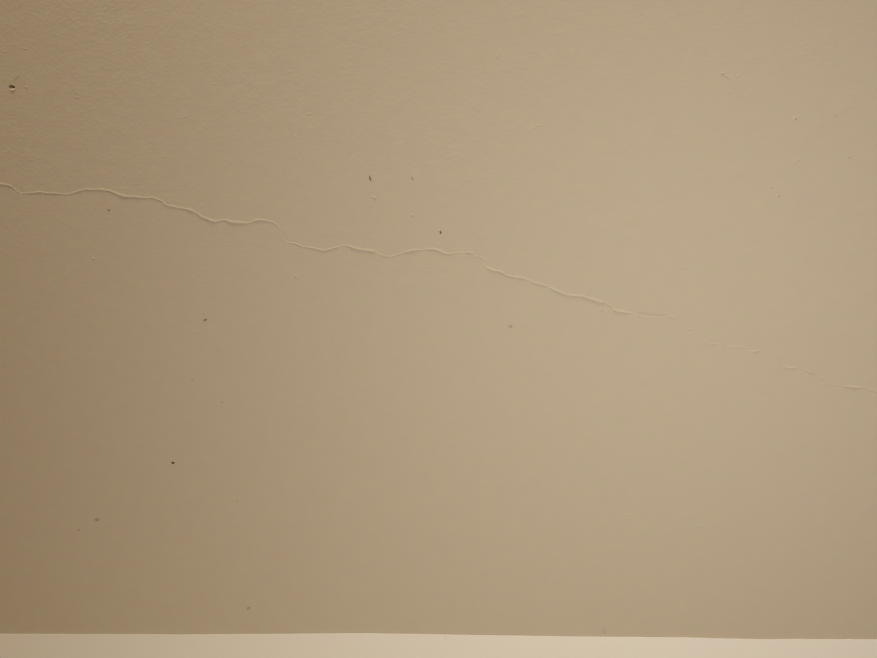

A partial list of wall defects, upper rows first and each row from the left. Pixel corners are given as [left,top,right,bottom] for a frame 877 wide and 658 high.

crack [0,182,877,392]